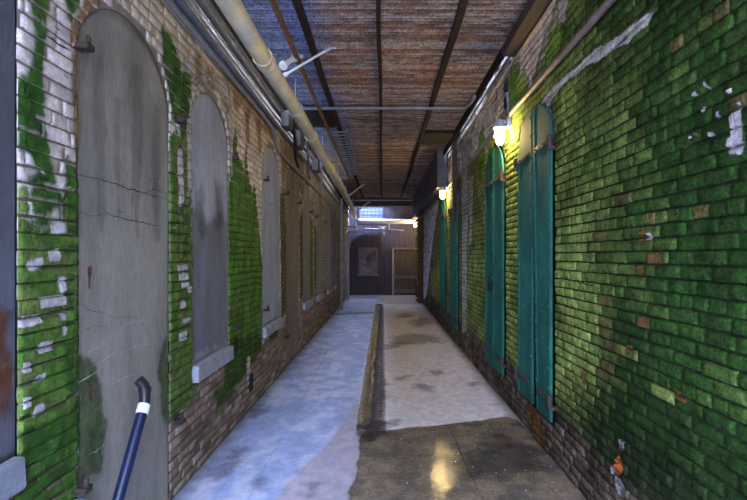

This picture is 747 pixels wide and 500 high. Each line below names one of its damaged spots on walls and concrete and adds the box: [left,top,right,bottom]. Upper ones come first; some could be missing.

peeling [716,101,745,155]
peeling [50,222,66,234]
peeling [26,249,61,271]
peeling [18,276,67,336]
crack [76,148,165,484]
rust [0,312,11,414]
peeling [19,397,45,418]
peeling [20,362,46,379]
peeling [38,340,53,354]
damp [65,312,107,483]
damp [157,338,167,422]
spalling [610,466,627,499]